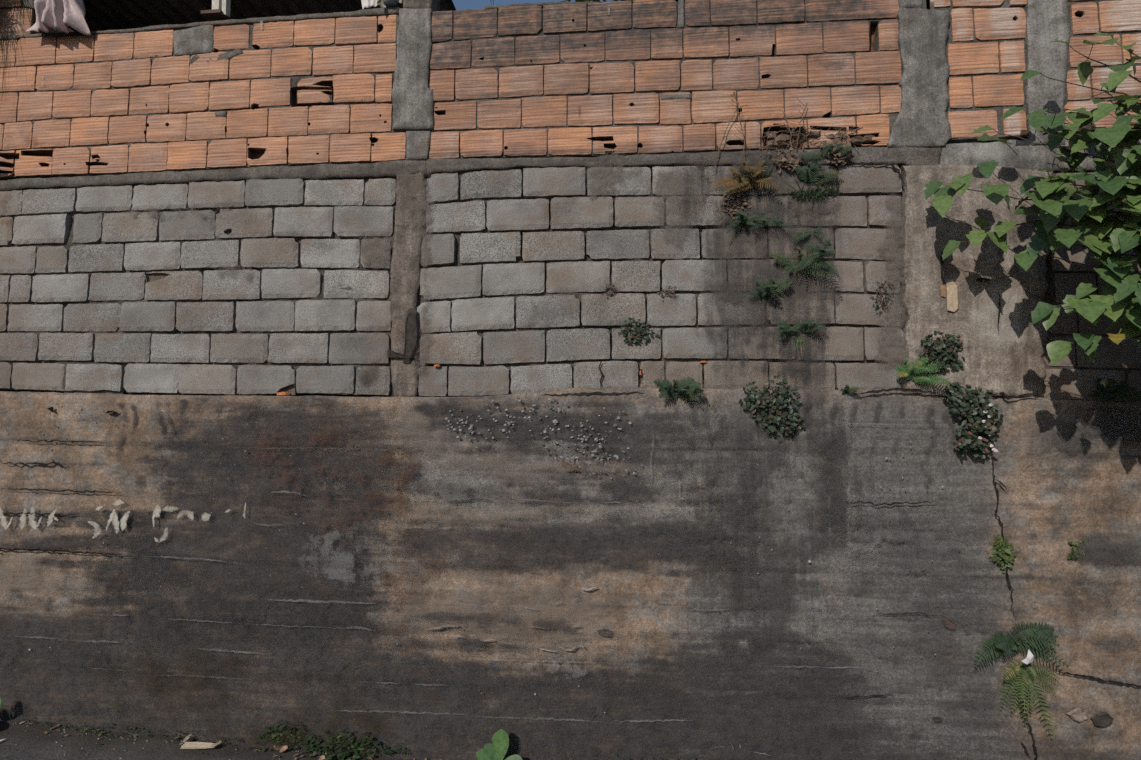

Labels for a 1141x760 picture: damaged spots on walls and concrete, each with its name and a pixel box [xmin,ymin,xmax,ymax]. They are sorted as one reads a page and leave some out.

spalling [291,80,335,107]
spalling [760,130,804,150]
leakage [0,149,942,760]
crack [992,456,1017,618]
crack [1021,686,1038,760]